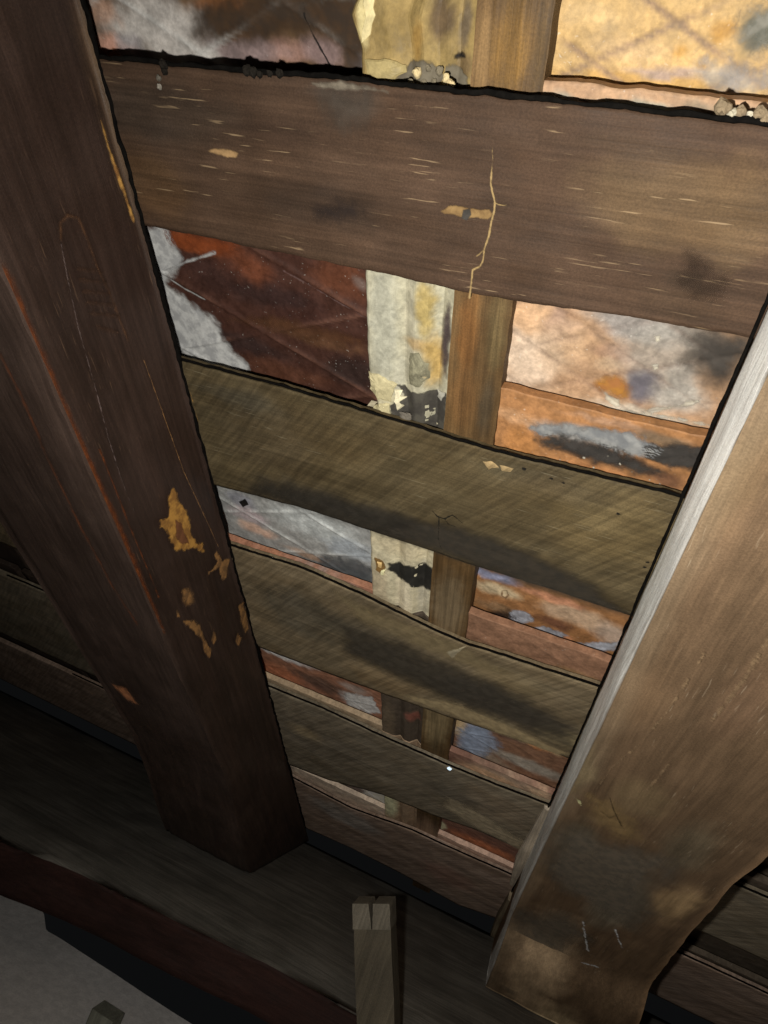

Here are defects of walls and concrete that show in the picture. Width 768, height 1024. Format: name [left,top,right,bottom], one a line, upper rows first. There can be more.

spalling [442,206,492,220]
crack [469,169,505,299]
peeling [160,488,229,579]
peeling [177,589,216,658]
peeling [236,603,249,646]